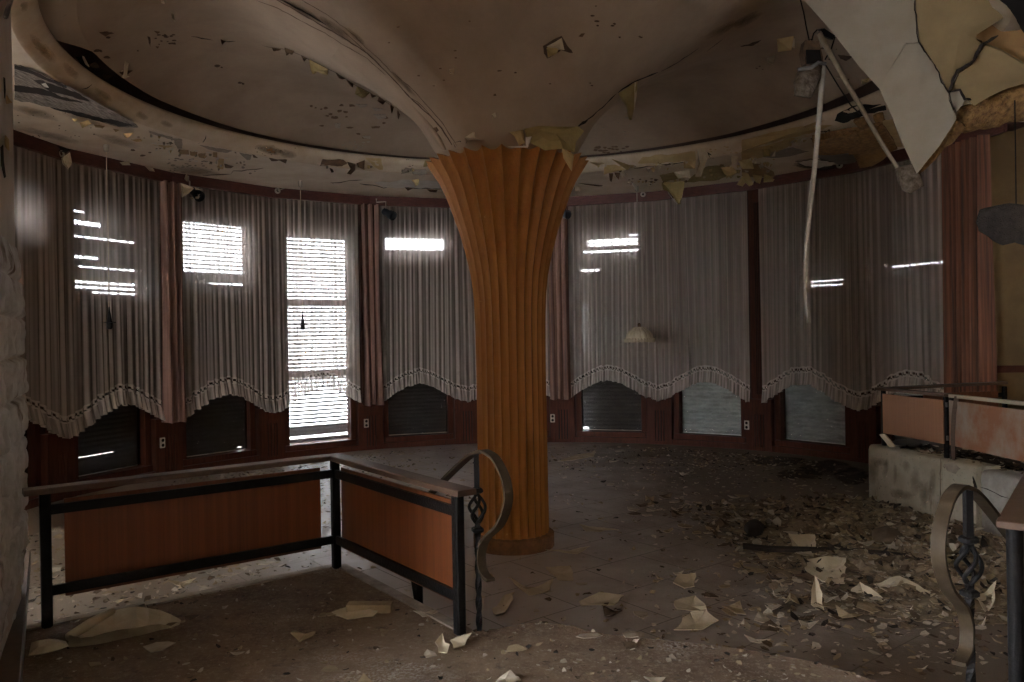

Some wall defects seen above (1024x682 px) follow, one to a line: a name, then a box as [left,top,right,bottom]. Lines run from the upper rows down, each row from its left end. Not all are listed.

crack [914,1,998,112]
flaking render [1000,0,1024,33]
flaking render [3,64,287,199]
peeling [509,126,584,171]
flaking render [573,104,903,204]